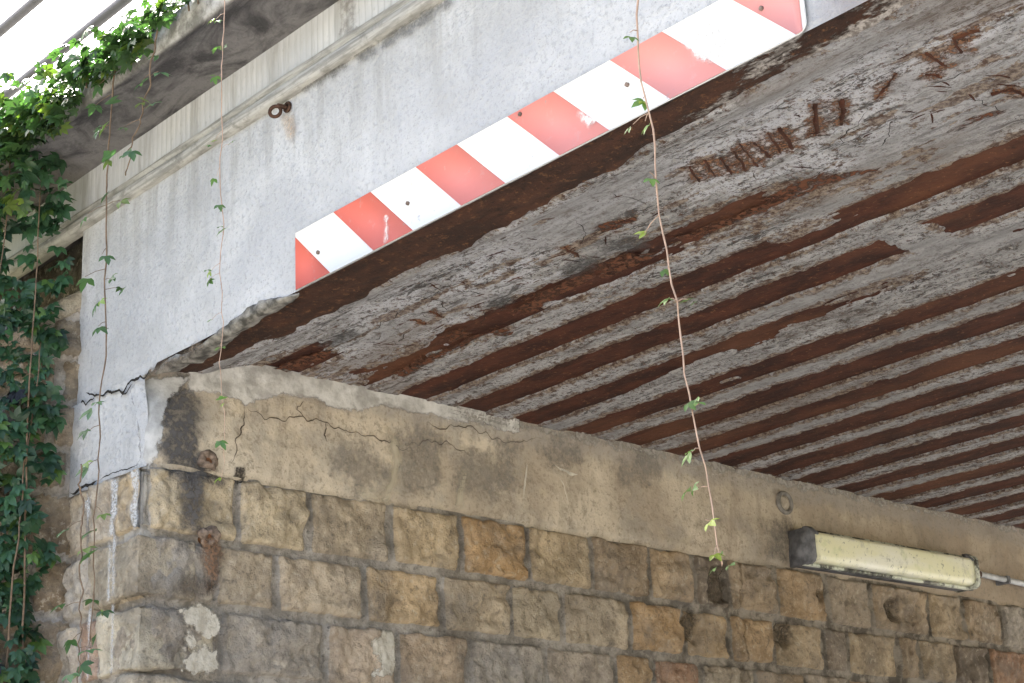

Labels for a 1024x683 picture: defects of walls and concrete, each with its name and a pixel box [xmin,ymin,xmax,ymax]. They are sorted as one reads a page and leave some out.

spalling [872,26,981,100]
spalling [986,75,1024,99]
spalling [947,110,1005,133]
spalling [661,98,880,239]
spalling [592,217,637,245]
crack [81,343,204,406]
spalling [155,293,299,375]
spalling [392,327,513,378]
crack [71,465,136,495]
water stain [159,374,220,530]
spalling [233,467,245,485]
crack [231,402,536,463]